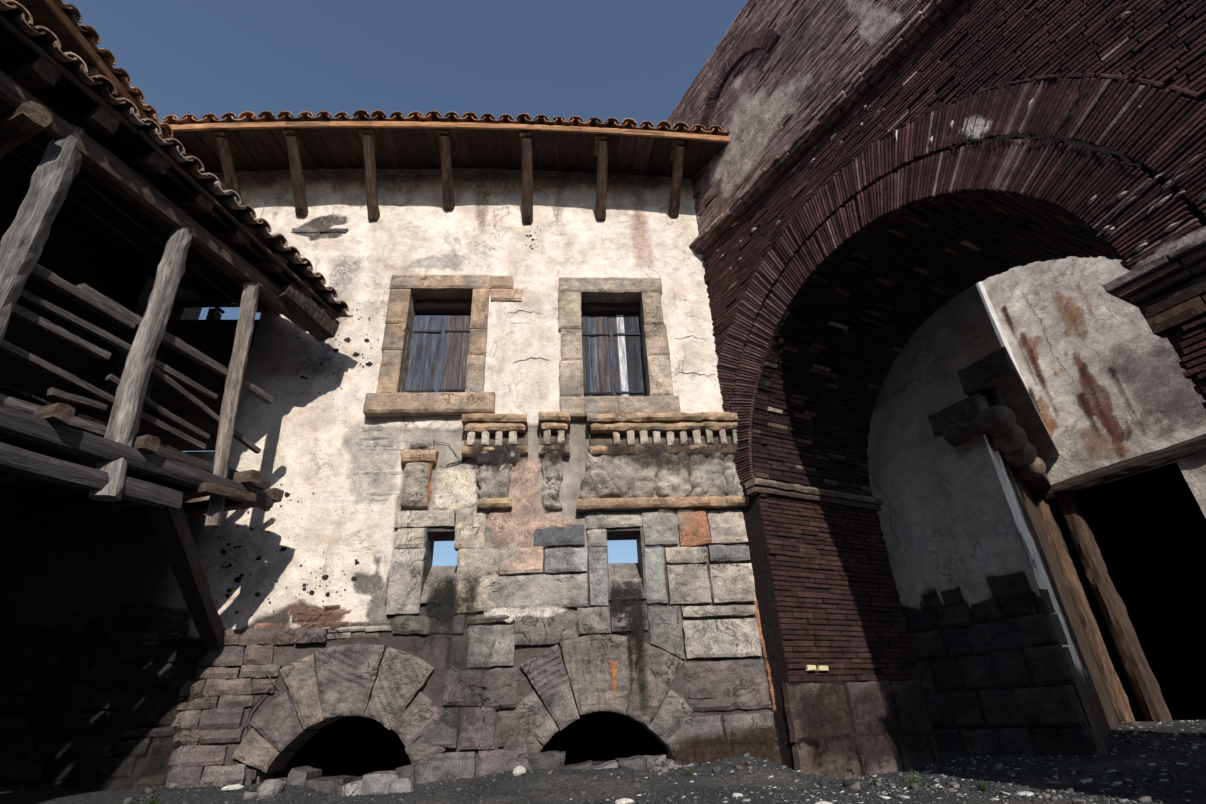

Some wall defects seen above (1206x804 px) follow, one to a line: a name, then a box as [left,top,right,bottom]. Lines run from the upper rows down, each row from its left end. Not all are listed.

flaking render [291,215,348,241]
corrosion [1053,284,1093,337]
corrosion [1002,306,1145,457]
flaking render [205,484,392,642]
damp [426,576,479,729]
damp [609,580,646,709]